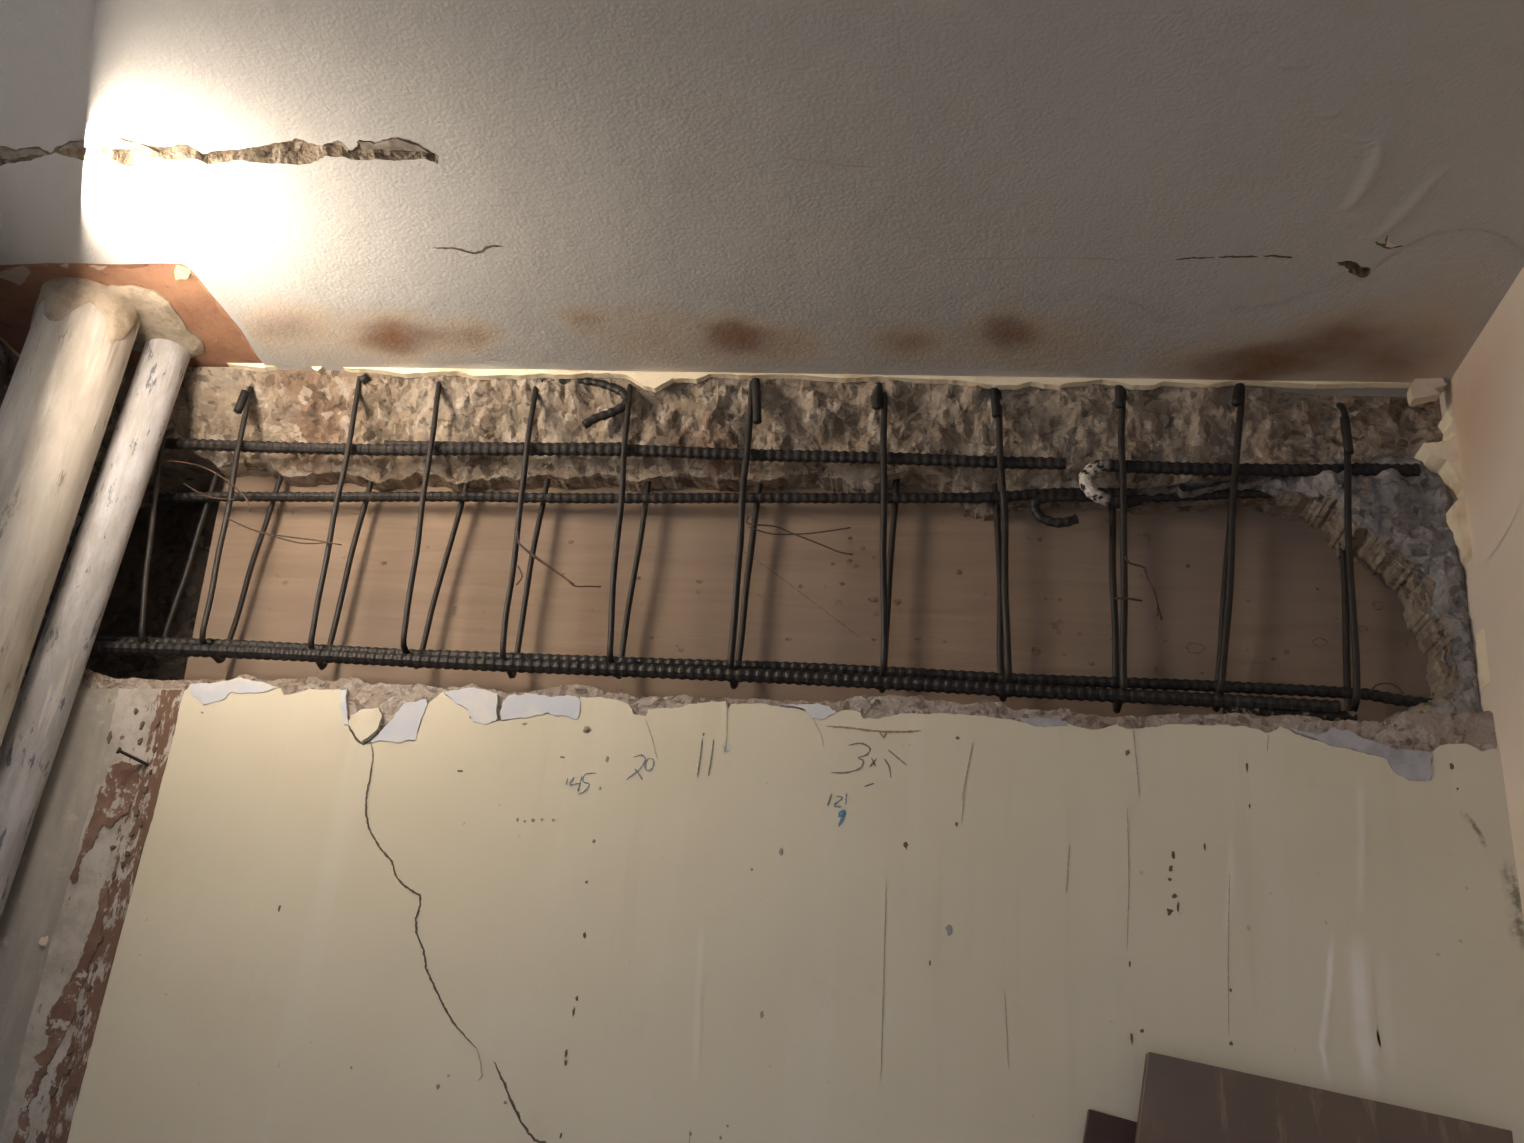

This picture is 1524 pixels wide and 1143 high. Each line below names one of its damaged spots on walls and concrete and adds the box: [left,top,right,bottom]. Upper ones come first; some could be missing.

flaking render [0,137,439,167]
rust [225,230,1524,383]
spalling [0,261,1497,1143]
crack [348,725,546,1143]